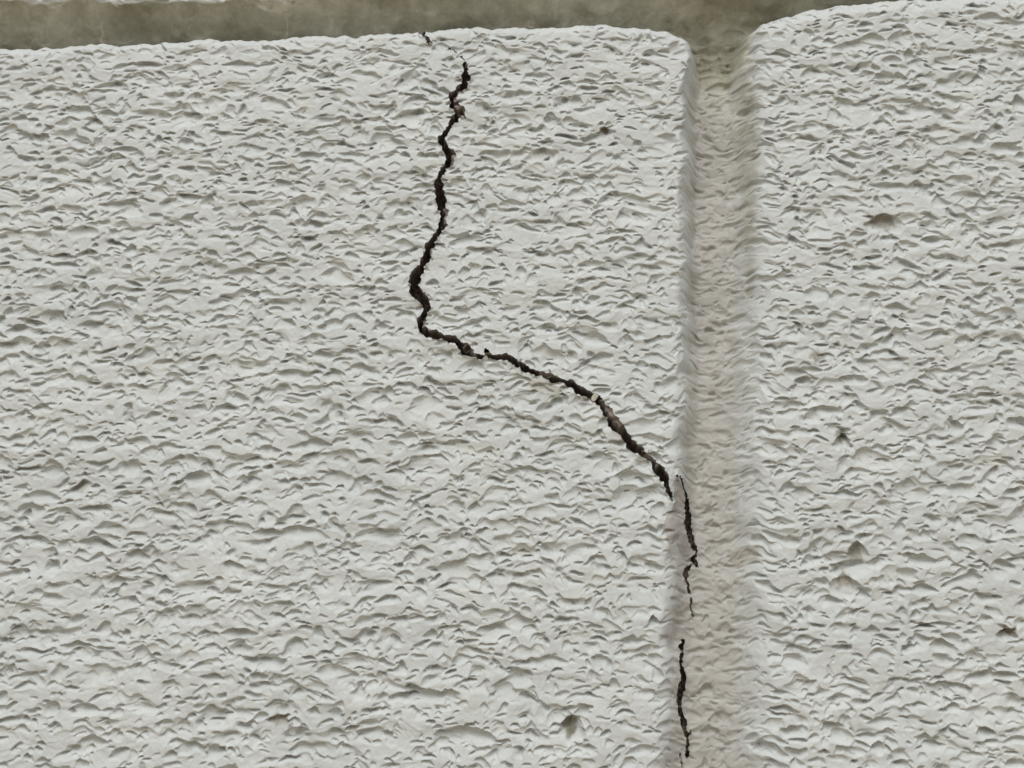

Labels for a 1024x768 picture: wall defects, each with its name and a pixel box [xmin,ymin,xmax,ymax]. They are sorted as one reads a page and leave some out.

crack [408,32,699,768]